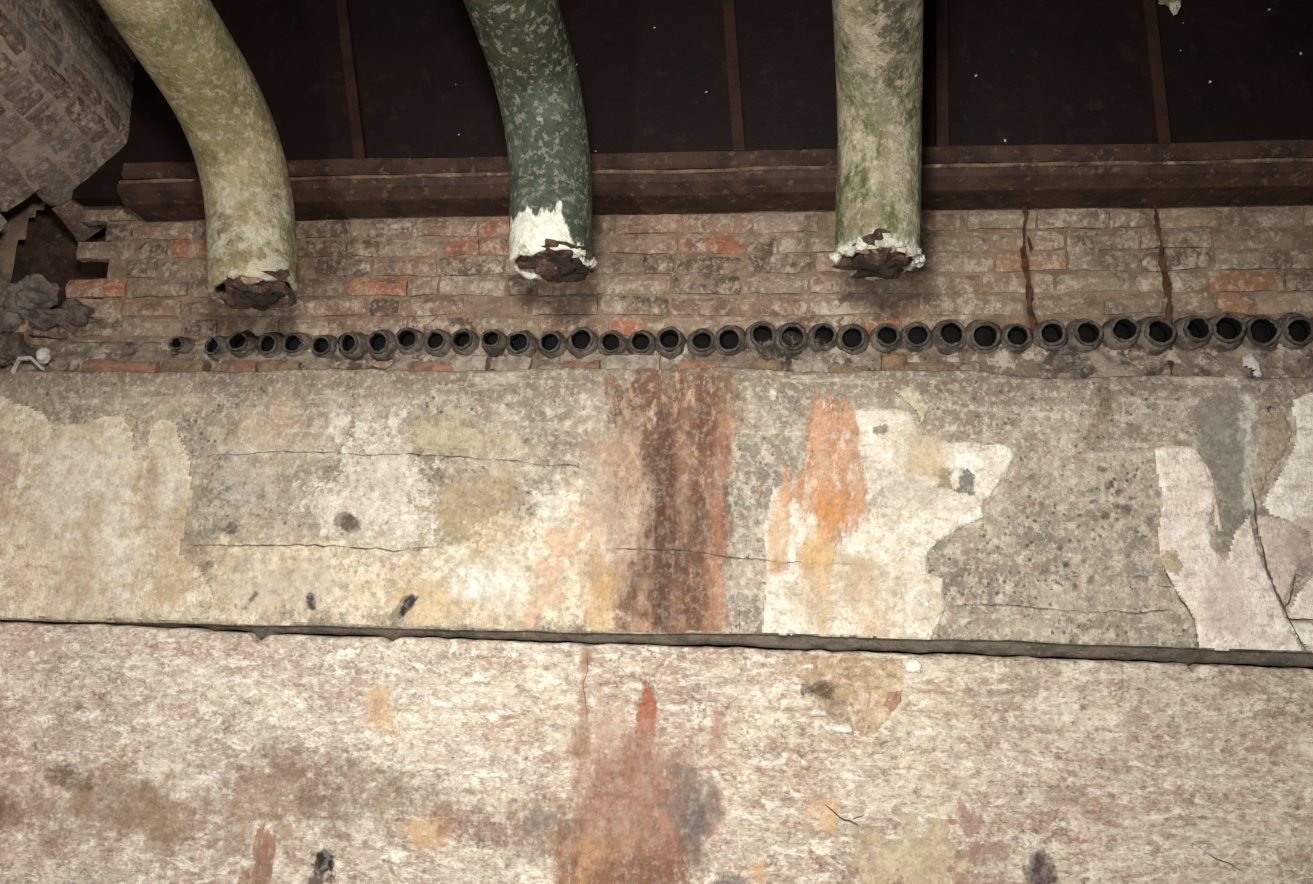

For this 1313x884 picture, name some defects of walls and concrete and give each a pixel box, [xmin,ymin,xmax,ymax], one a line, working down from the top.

spalling [10,203,109,310]
rust [554,679,700,884]
rust [577,368,740,633]
rust [770,387,870,629]
spalling [791,654,921,734]
peeling [745,352,1015,640]
peeling [1154,393,1313,653]
crack [1251,487,1313,659]